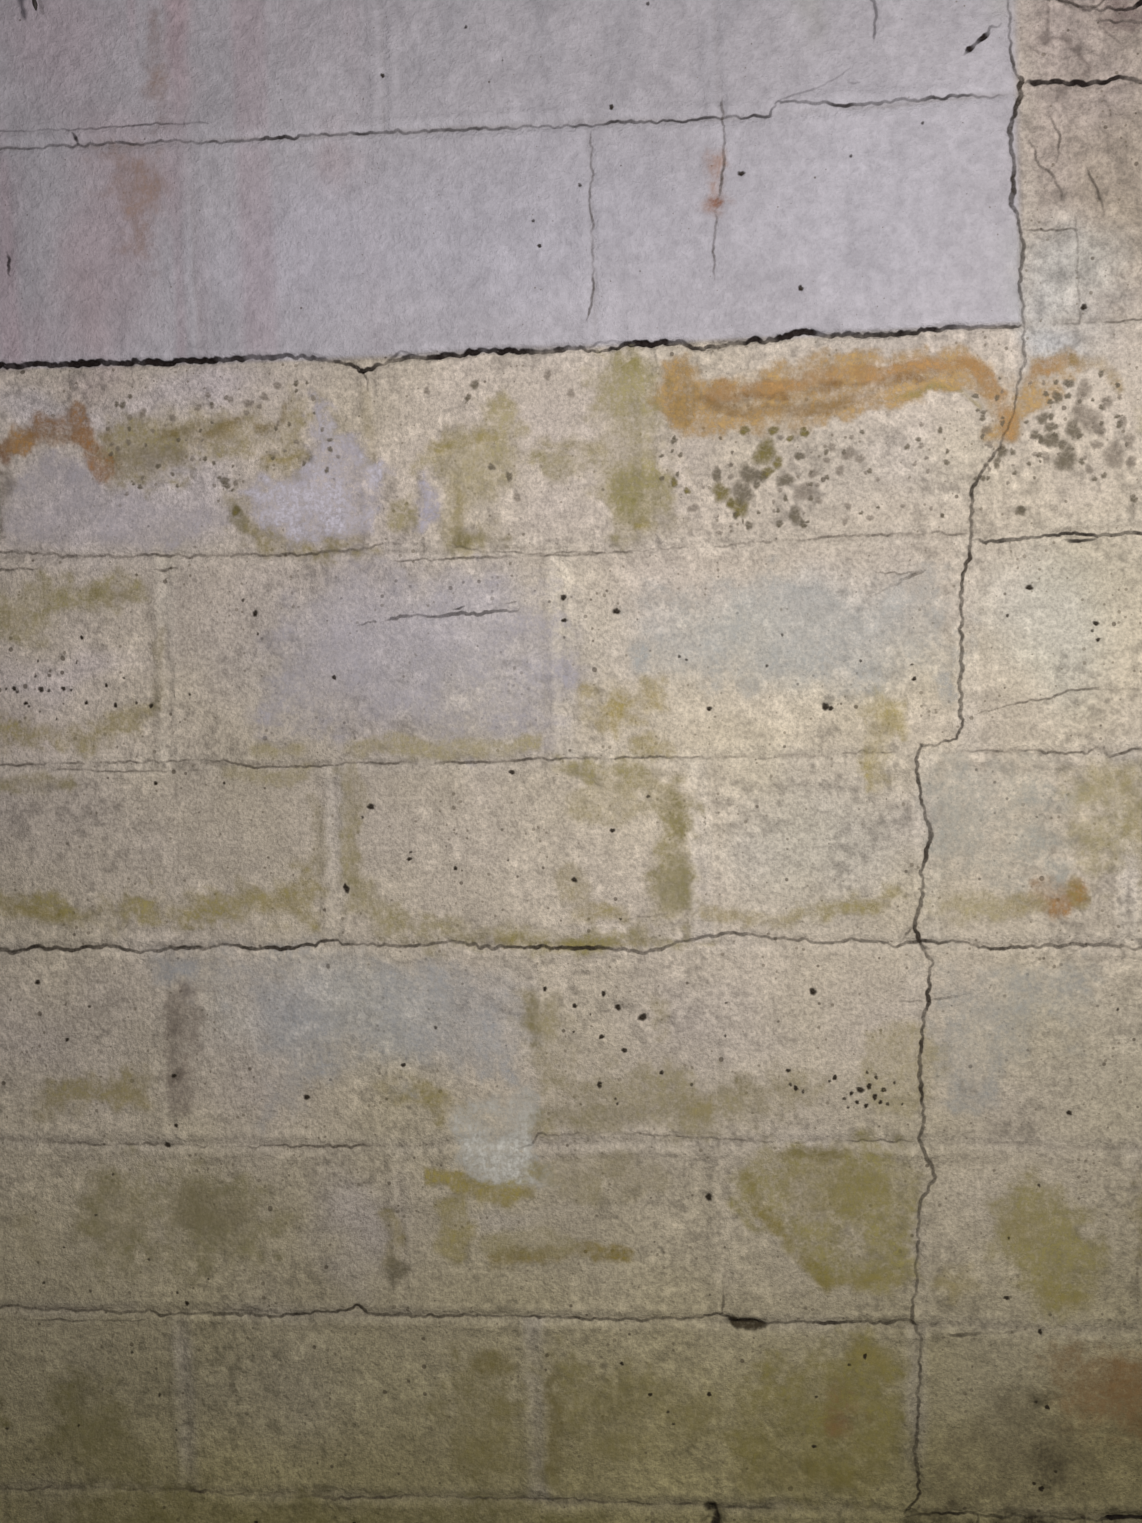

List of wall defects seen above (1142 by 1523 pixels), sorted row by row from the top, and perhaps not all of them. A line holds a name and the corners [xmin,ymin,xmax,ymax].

crack [966,33,1128,329]
crack [0,280,957,374]
rust [0,403,114,475]
rust [653,348,1075,440]
crack [959,453,1006,678]
crack [0,939,350,954]
crack [472,942,663,952]
crack [897,715,964,1169]
crack [982,942,1082,950]
water stain [730,1146,912,1290]
crack [268,1303,368,1317]
crack [816,1318,891,1326]